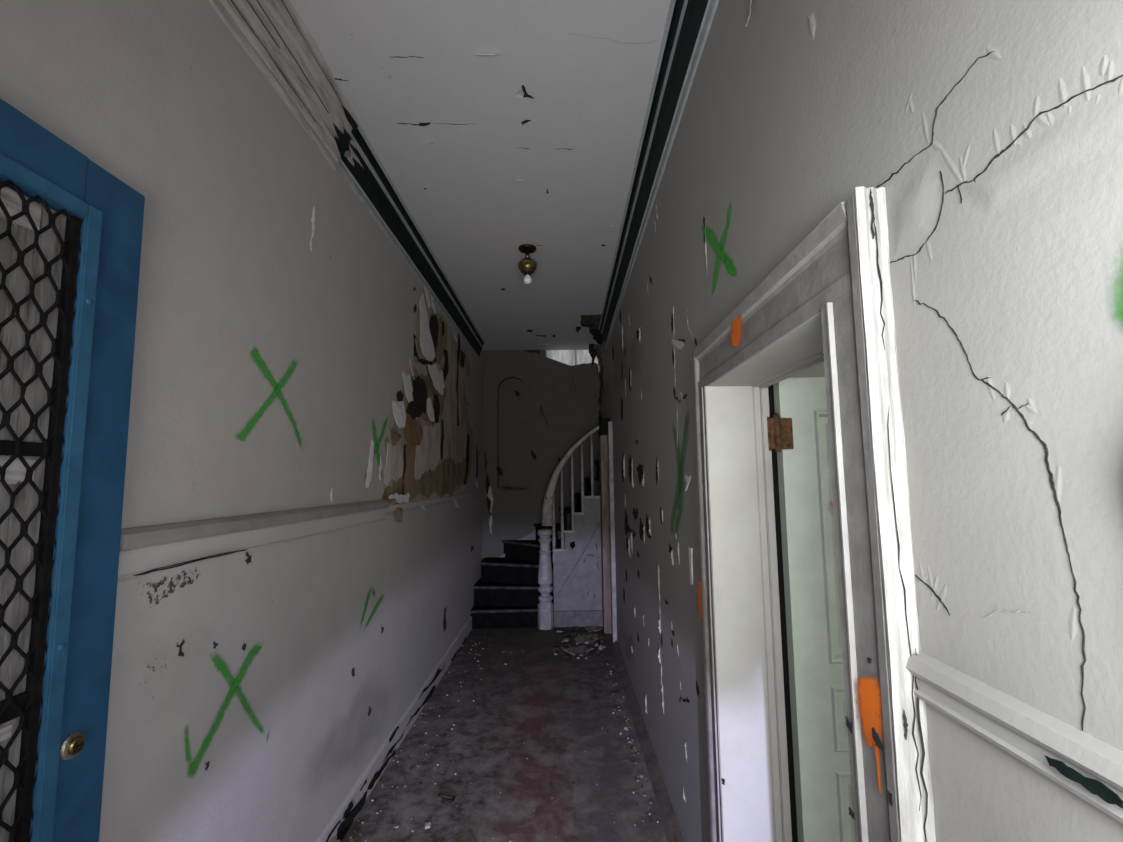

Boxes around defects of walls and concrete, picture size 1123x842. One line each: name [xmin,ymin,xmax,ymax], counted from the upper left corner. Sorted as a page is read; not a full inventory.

peeling [333,104,364,169]
flaking render [365,286,503,534]
peeling [523,330,598,373]
peeling [576,310,642,421]
crack [870,46,1123,731]
peeling [621,439,693,713]
crack [888,412,950,842]
spalling [1045,755,1123,808]